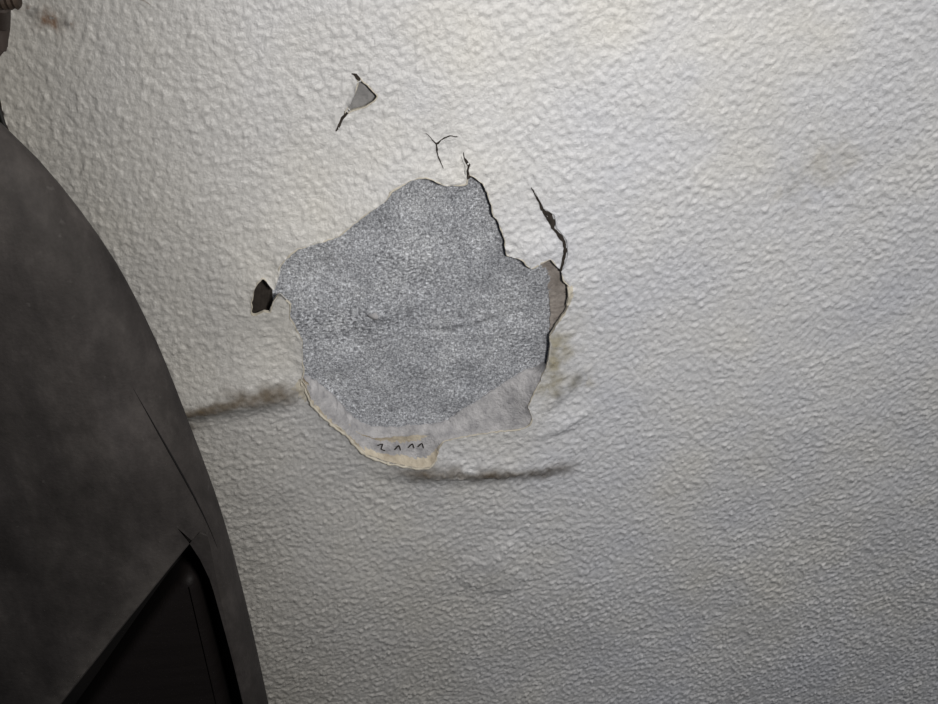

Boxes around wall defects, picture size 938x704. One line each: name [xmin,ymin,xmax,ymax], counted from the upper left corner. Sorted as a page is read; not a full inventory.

peeling [335,73,378,131]
crack [531,187,569,271]
peeling [250,175,574,470]